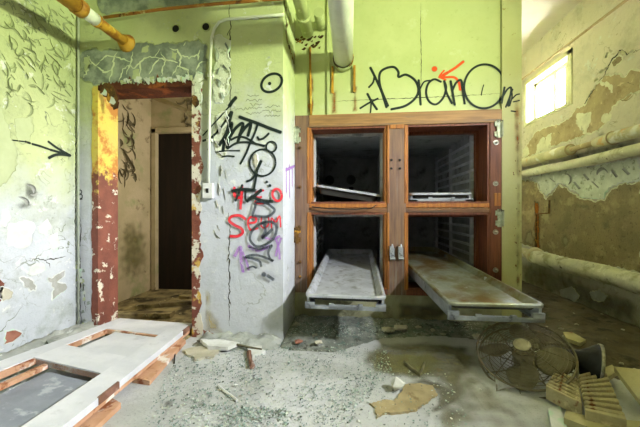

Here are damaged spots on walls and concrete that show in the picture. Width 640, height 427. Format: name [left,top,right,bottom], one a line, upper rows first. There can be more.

peeling [0,0,233,214]
spalling [522,50,640,158]
crack [584,50,637,104]
crack [36,101,86,321]
spalling [0,286,14,302]
flaking render [3,329,23,345]
spalling [19,263,67,301]
crack [225,213,233,326]